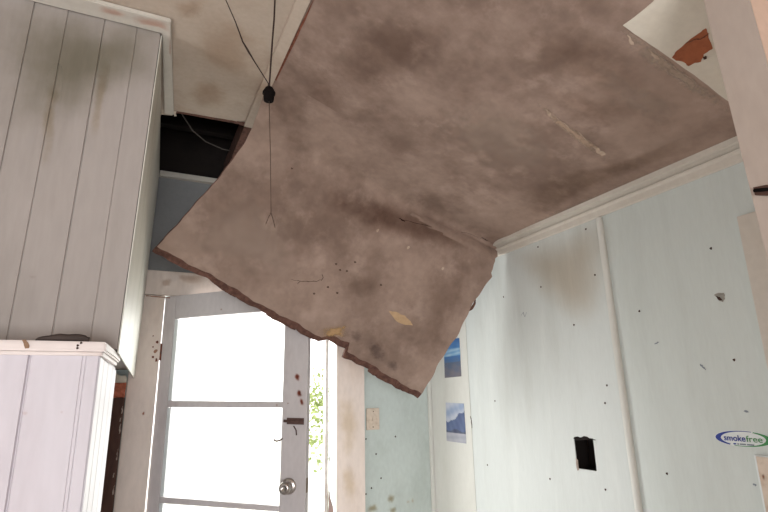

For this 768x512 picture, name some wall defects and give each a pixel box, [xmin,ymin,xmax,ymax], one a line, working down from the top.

peeling [623,0,728,101]
spalling [573,436,597,471]